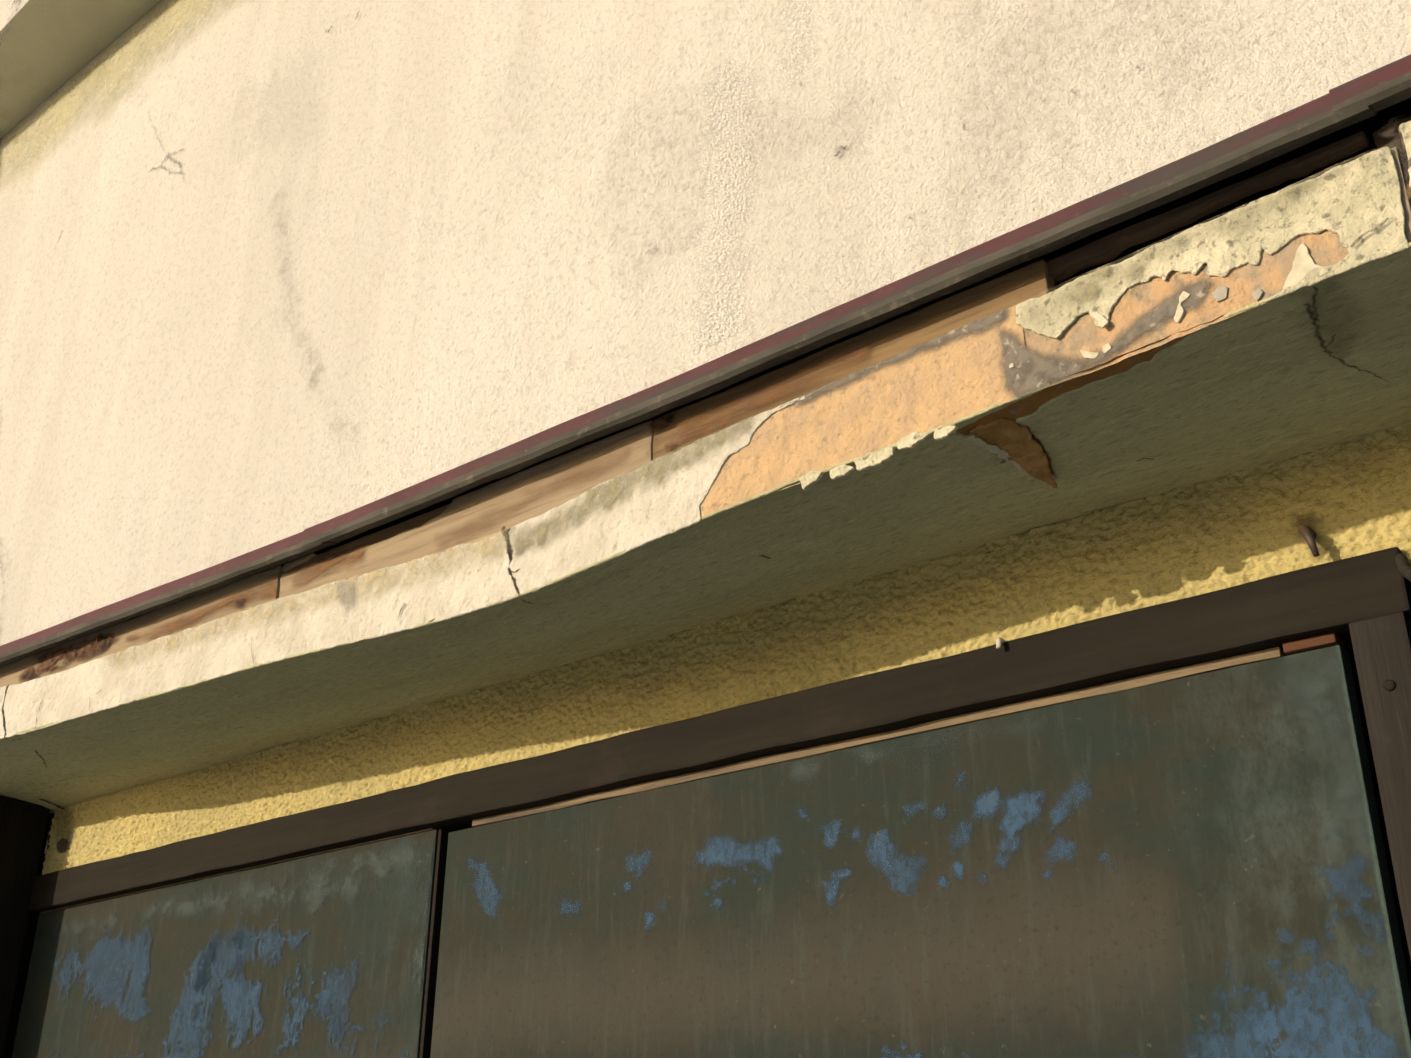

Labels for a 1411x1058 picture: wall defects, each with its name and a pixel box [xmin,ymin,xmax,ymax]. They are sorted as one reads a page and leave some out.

crack [1381,115,1411,191]
spalling [700,146,1411,517]
crack [1306,287,1382,379]
crack [501,526,534,604]